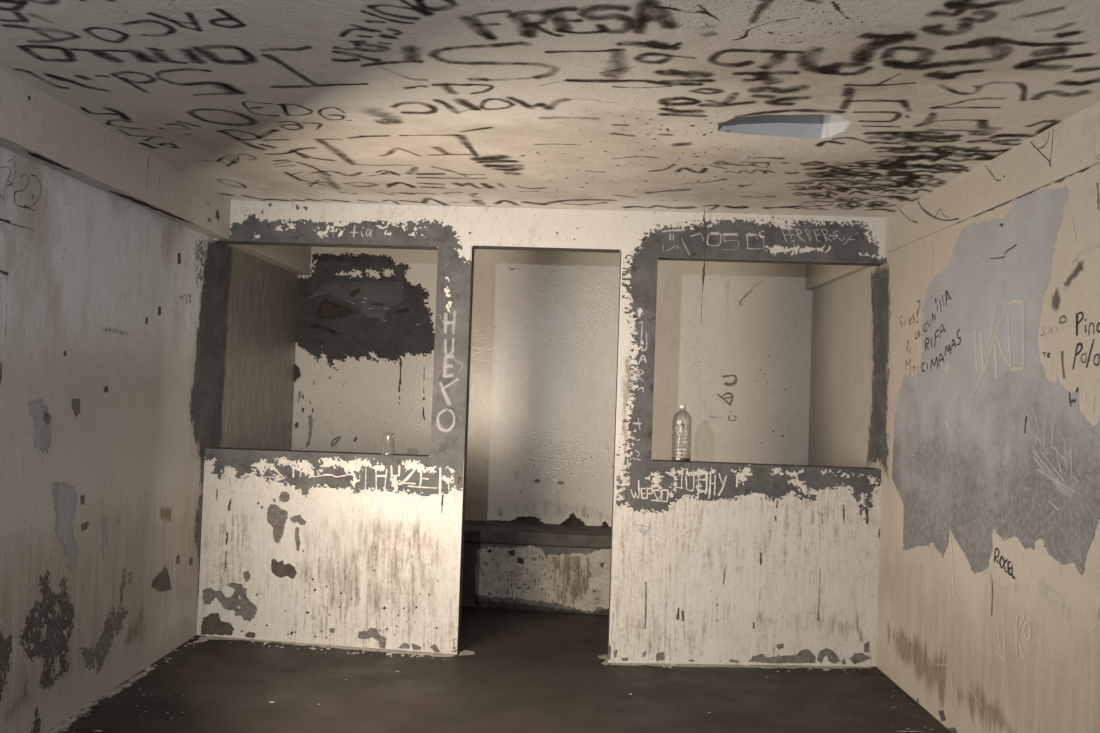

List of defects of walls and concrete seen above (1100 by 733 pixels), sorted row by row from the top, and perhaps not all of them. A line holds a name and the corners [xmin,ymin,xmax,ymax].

peeling [180,203,471,551]
peeling [616,187,1100,575]
flaking render [0,481,133,701]
flaking render [151,555,193,592]
flaking render [271,558,297,579]
flaking render [358,628,457,653]
leakage [897,633,946,701]
flaking render [30,706,41,733]